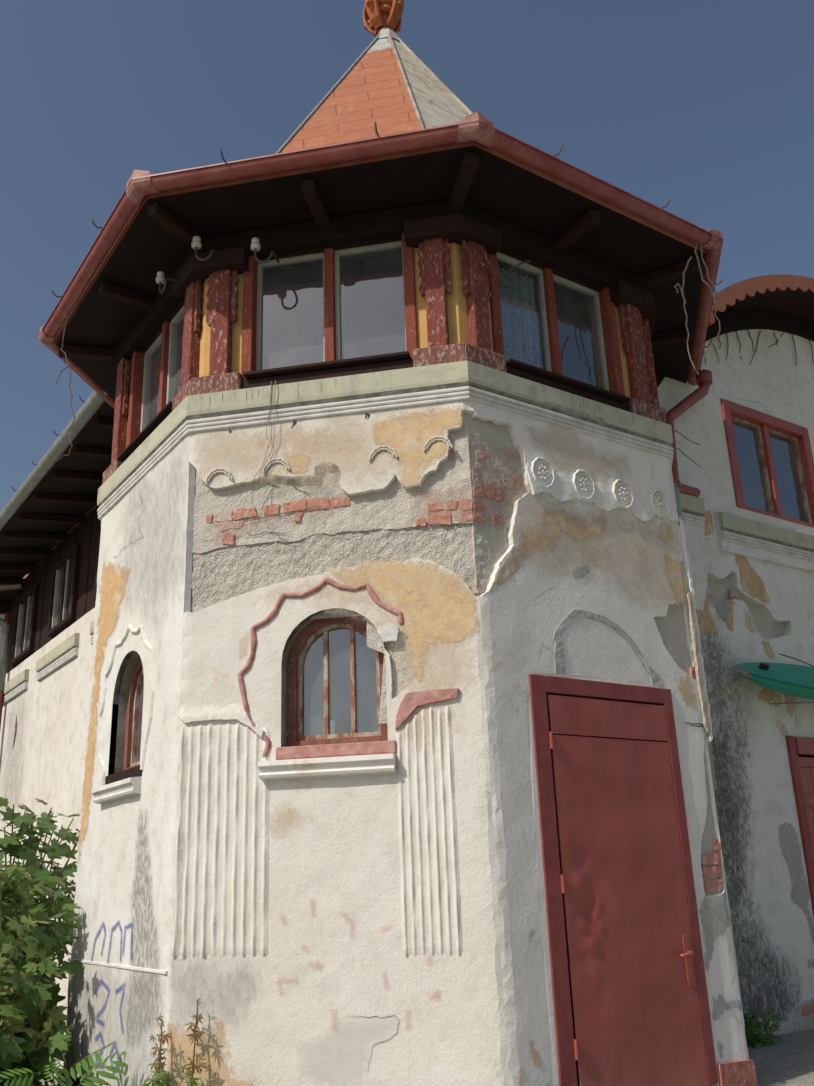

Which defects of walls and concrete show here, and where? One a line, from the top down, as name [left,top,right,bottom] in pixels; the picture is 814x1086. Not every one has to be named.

flaking render [190,407,528,724]
peeling [654,516,784,896]
leakage [699,631,800,1025]
peeling [167,1022,252,1086]